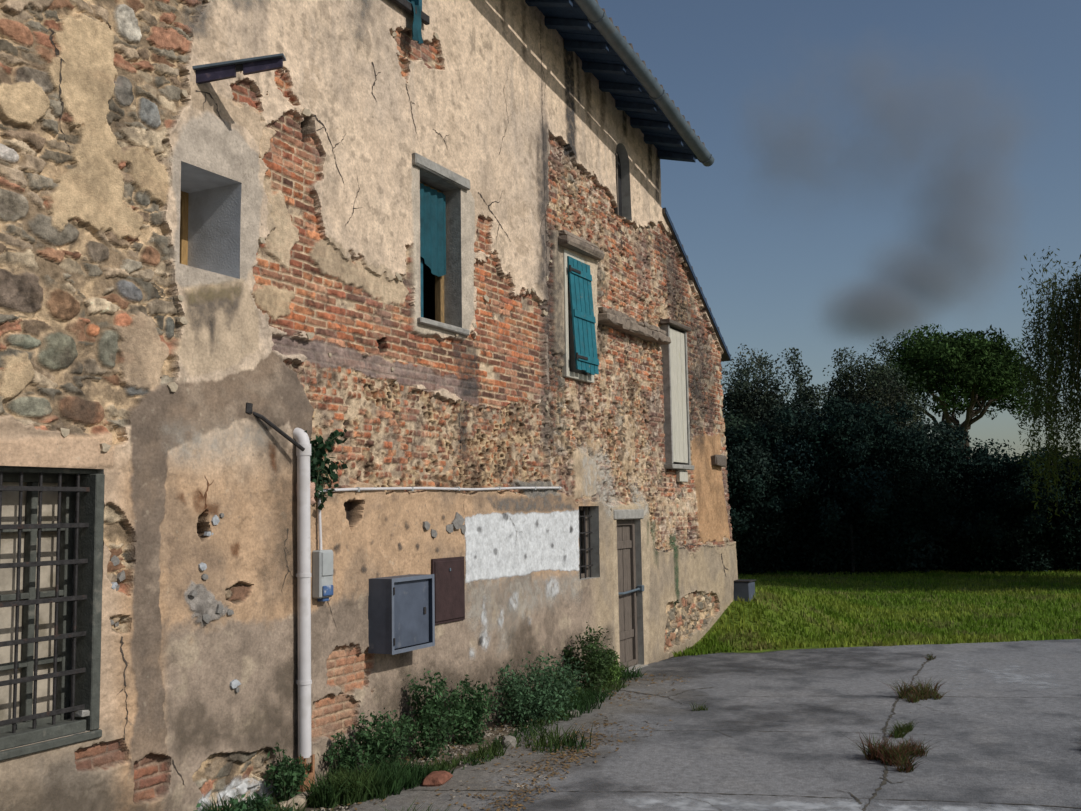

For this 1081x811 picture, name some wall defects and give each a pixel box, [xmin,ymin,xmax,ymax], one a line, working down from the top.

spalling [389,26,445,83]
crack [309,115,363,223]
spalling [230,67,733,554]
spalling [197,510,224,539]
crack [117,636,128,746]
spalling [311,642,375,741]
spalling [75,738,172,802]